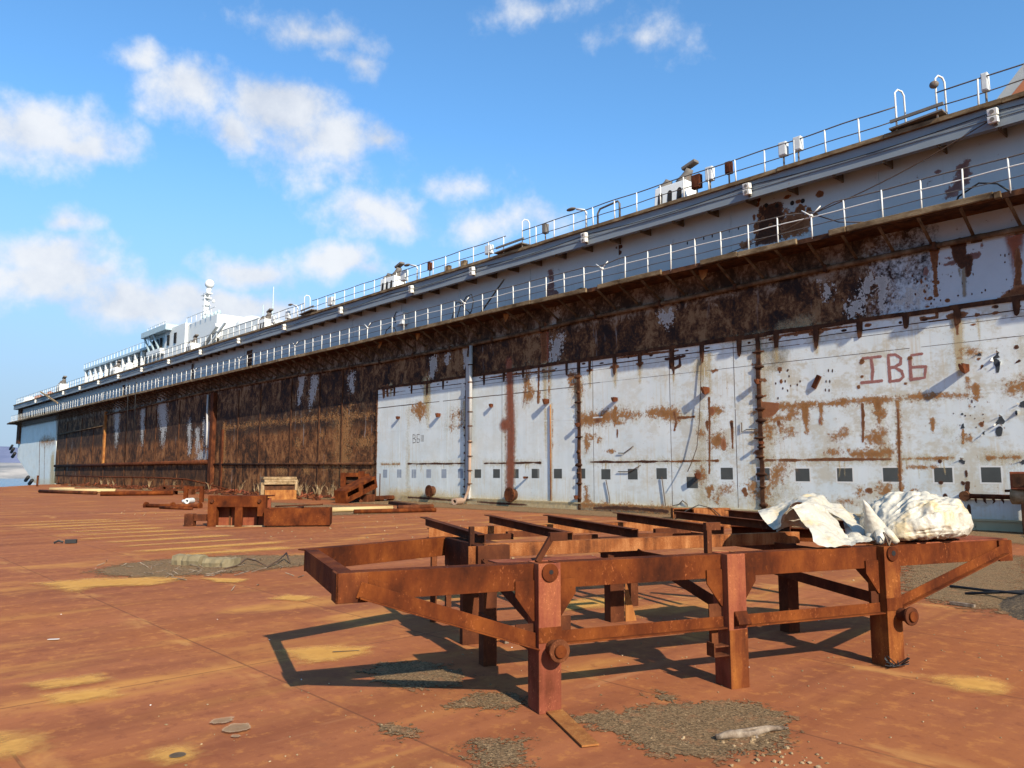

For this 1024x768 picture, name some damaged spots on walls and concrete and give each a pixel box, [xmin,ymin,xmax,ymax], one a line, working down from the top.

corrosion [222,404,376,488]
corrosion [390,234,1024,517]